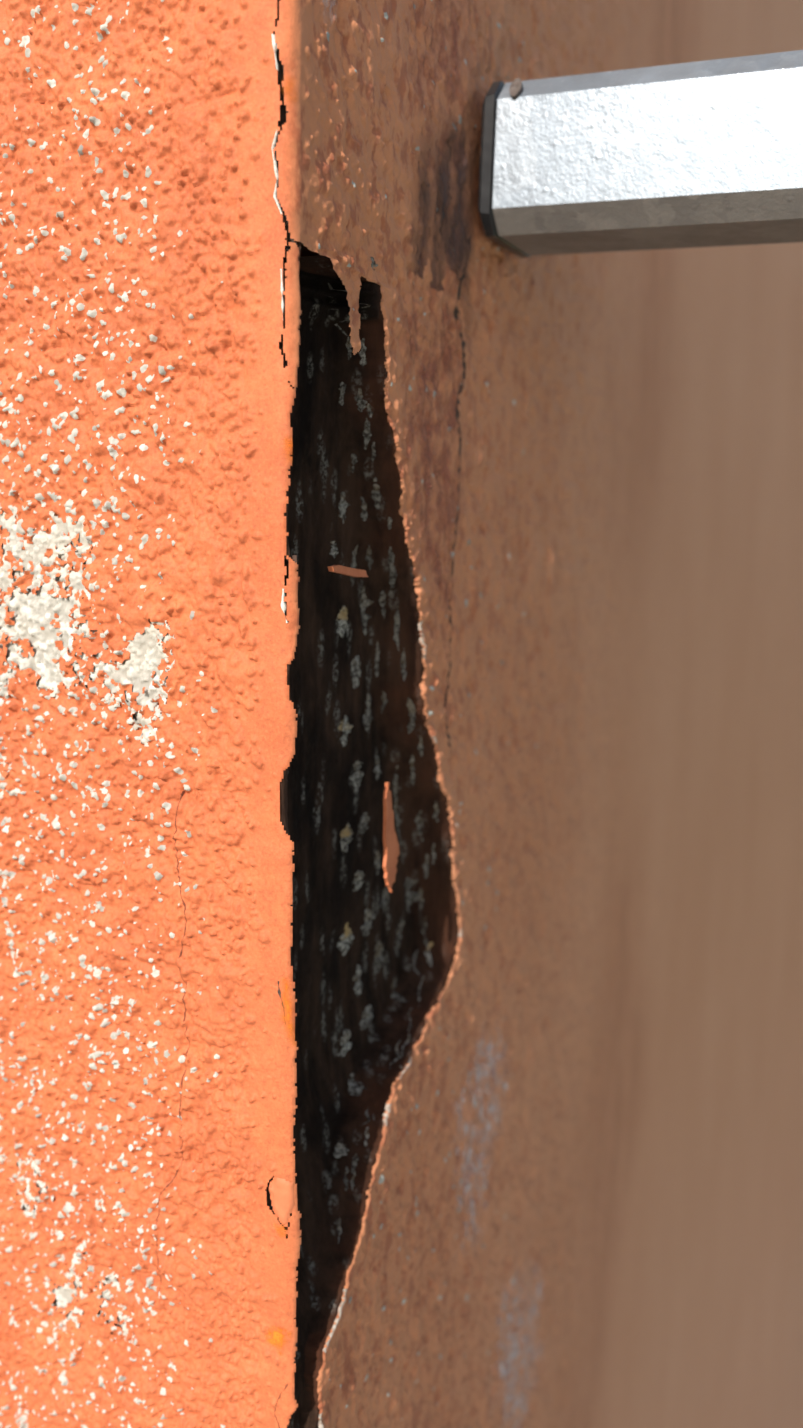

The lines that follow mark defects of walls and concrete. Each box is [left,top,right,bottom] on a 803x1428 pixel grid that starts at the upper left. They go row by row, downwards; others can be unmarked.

crack [271,0,298,387]
peeling [0,737,12,782]
peeling [0,506,175,747]
spalling [270,241,462,1428]